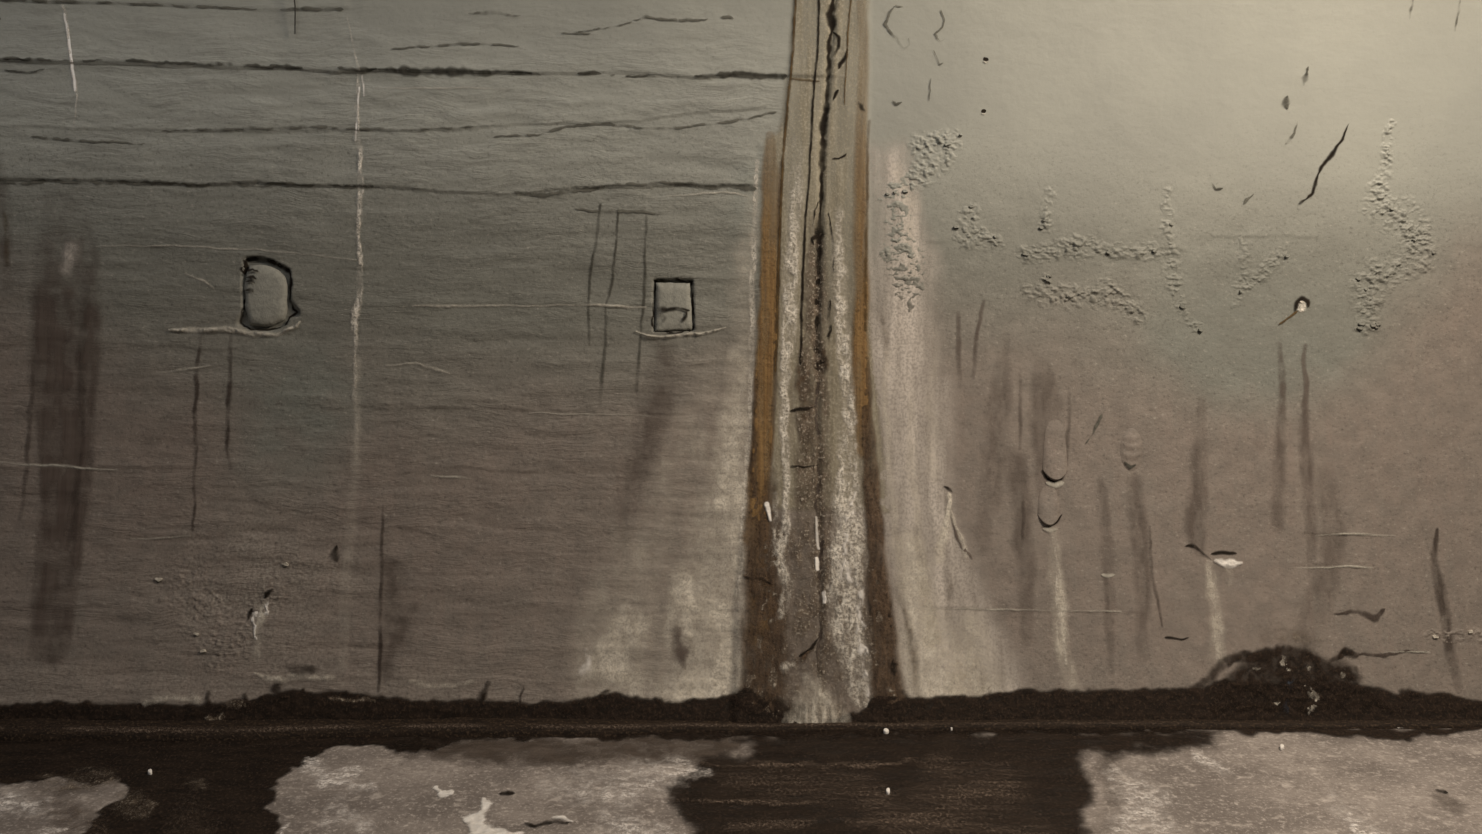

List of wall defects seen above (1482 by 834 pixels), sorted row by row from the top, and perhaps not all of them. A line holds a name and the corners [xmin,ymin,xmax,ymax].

crack [3,57,302,73]
crack [2,0,343,11]
crack [337,12,532,76]
crack [4,179,374,189]
damp [356,83,364,265]
crack [1299,124,1349,204]
spalling [240,256,298,331]
crack [421,0,864,678]
damp [0,150,1482,741]
rust [742,188,784,711]
rust [853,158,905,704]
damp [0,728,1215,834]